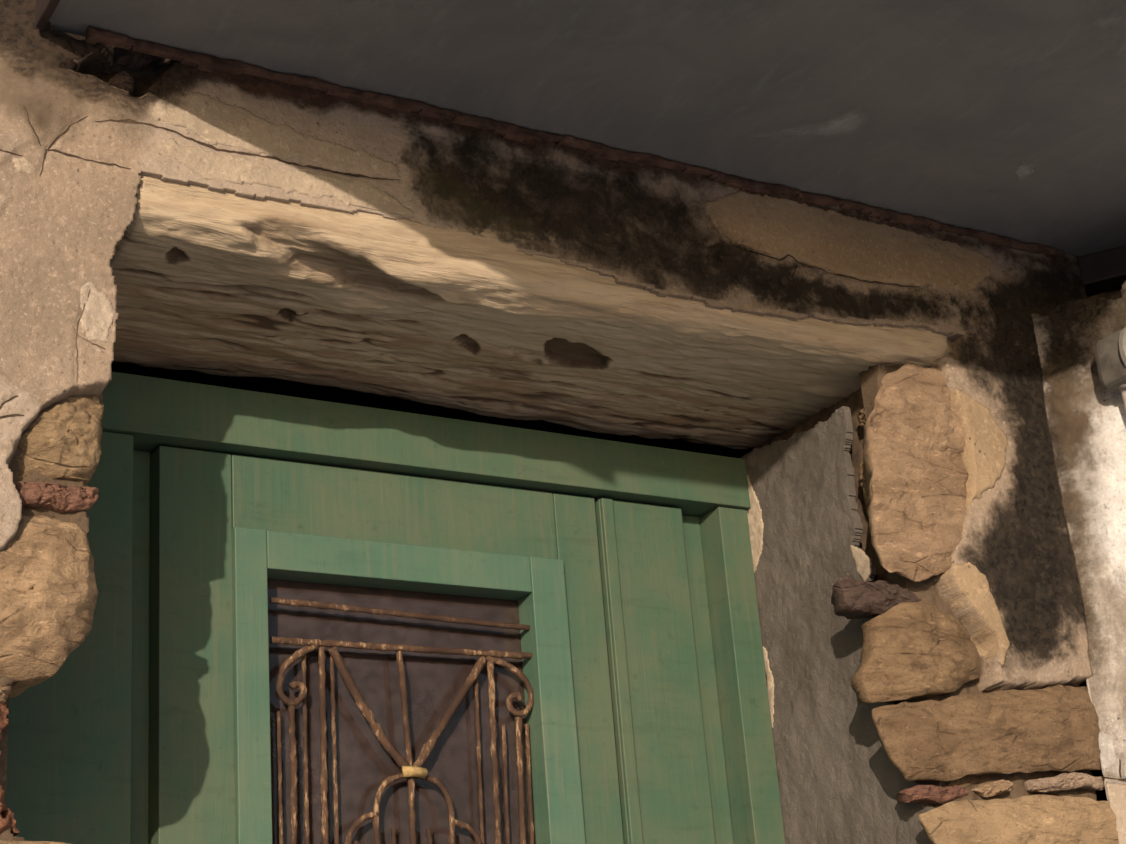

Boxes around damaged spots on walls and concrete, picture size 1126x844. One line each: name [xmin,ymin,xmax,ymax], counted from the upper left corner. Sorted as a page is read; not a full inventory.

leakage [0,0,208,109]
crack [0,106,401,181]
crack [76,289,105,380]
crack [0,395,24,418]
leakage [403,120,1124,666]
spalling [0,392,104,757]
spalling [831,363,1119,844]
spalling [0,785,71,844]
crack [1101,759,1126,782]